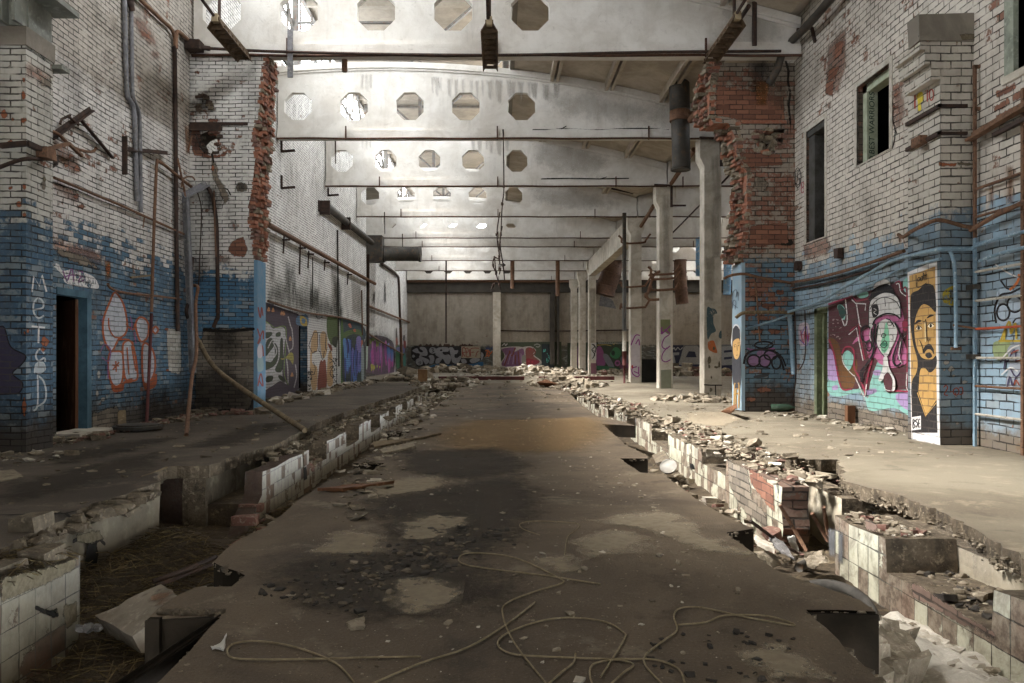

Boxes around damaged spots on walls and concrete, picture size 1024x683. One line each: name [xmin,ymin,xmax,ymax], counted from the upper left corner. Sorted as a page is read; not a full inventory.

spalling [190,93,227,158]
spalling [219,57,279,263]
spalling [691,61,831,265]
flaking render [825,31,846,108]
water stain [273,418,595,619]
spalling [0,384,1024,683]